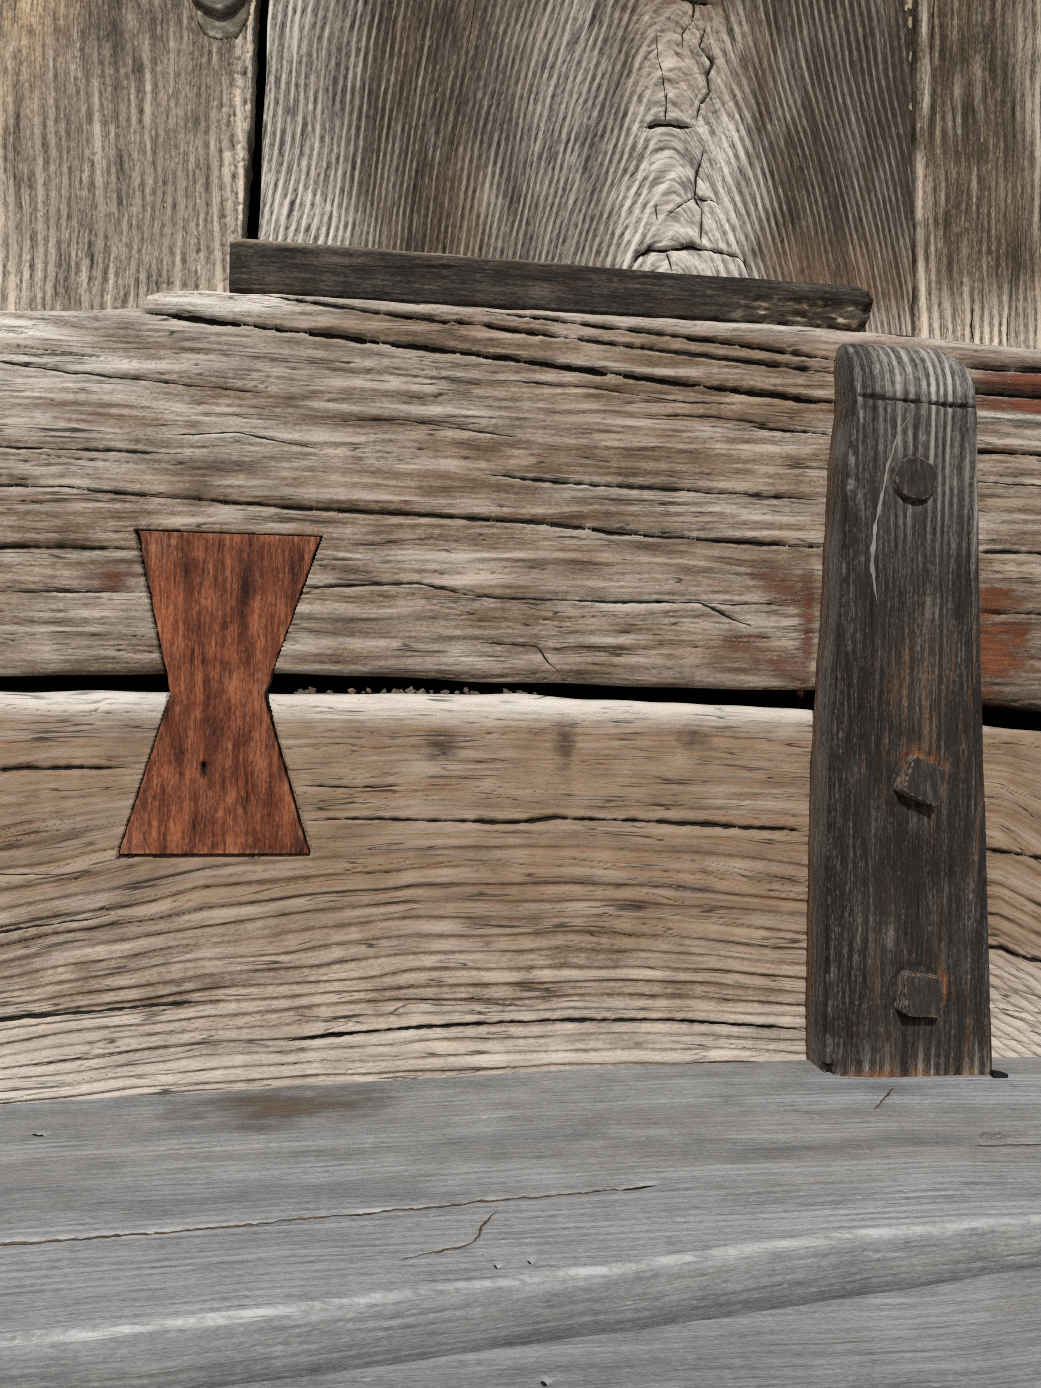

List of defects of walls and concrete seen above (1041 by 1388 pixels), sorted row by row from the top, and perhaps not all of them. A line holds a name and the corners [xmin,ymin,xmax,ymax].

crack [630,0,749,275]
rust [981,373,1041,413]
rust [980,587,1035,697]
crack [0,1185,656,1260]